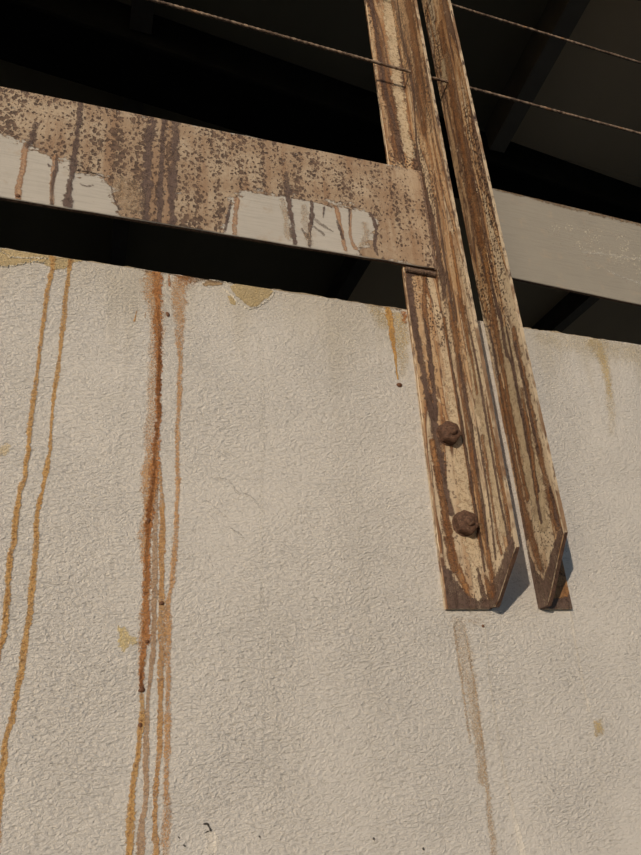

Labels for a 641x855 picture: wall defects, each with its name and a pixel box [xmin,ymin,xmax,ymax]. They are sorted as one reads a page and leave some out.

rust [0,259,73,838]
rust [125,268,223,855]
rust [0,0,573,652]